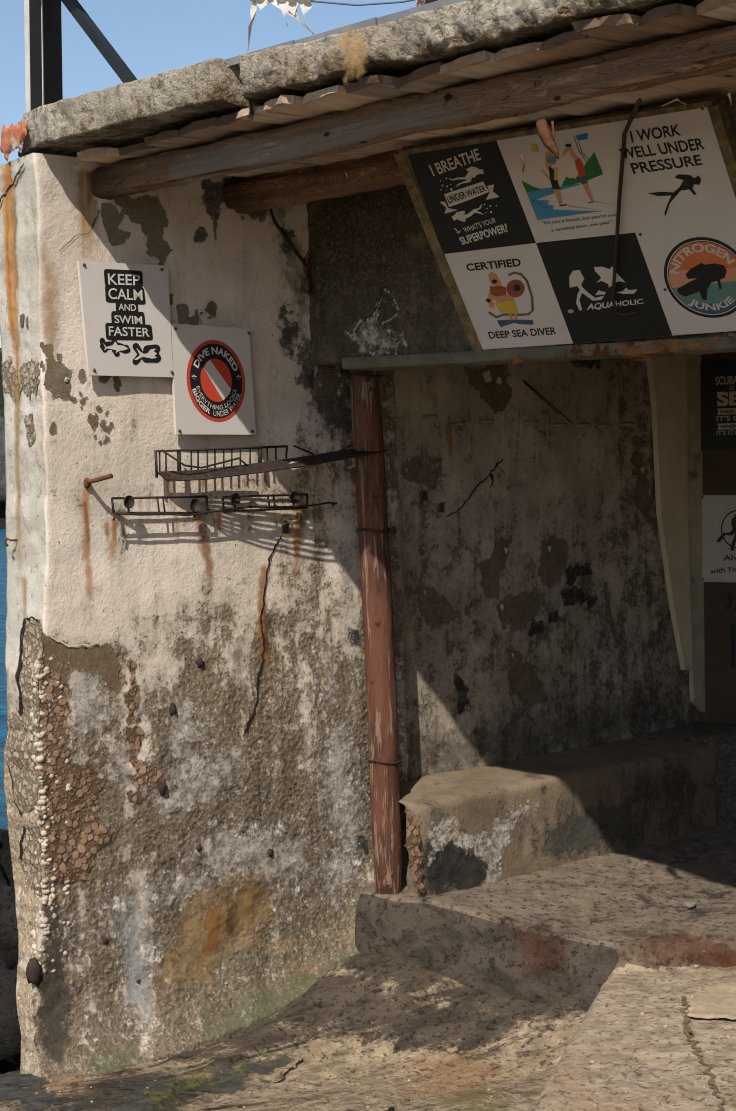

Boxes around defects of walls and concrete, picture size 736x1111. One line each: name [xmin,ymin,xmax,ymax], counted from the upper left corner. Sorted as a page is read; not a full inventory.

corrosion [2,166,18,364]
flaking render [100,194,173,266]
flaking render [1,342,122,446]
flaking render [464,364,512,414]
corrosion [82,488,91,590]
crack [446,459,505,517]
crack [244,536,281,732]
water stain [421,800,539,895]
crack [679,996,730,1111]